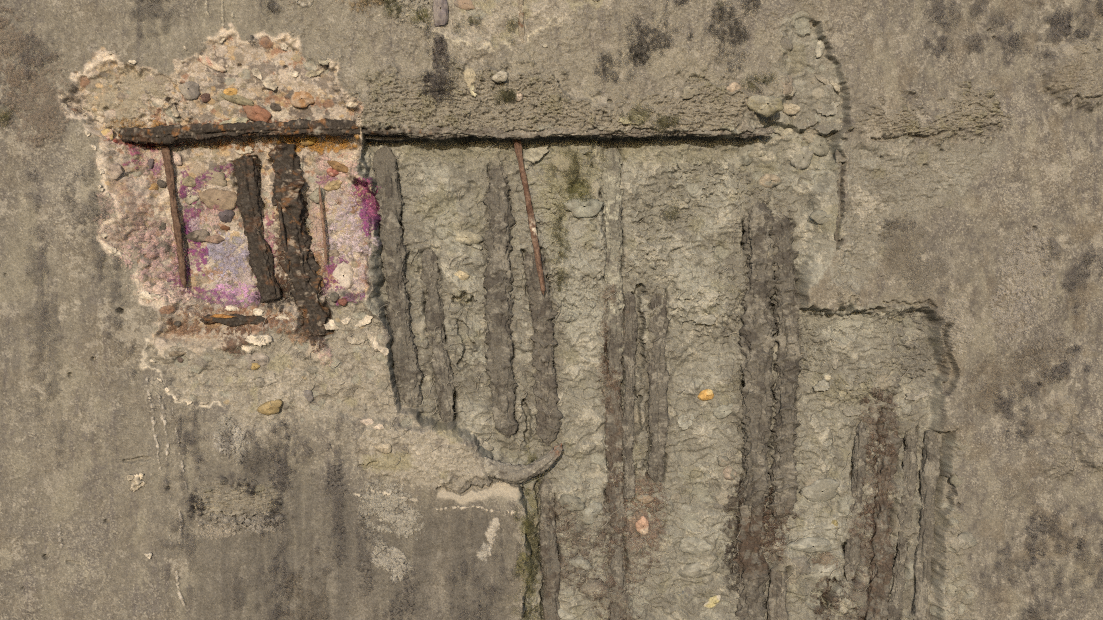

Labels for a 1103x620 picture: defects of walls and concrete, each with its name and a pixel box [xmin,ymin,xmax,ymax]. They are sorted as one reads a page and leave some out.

corrosion [108,135,454,422]
spalling [398,0,617,53]
corrosion [482,166,563,445]
spalling [141,14,1010,620]
corrosion [723,202,804,620]
crack [799,123,818,136]
crack [836,162,848,251]
corrosion [843,408,944,620]
crack [871,133,941,143]